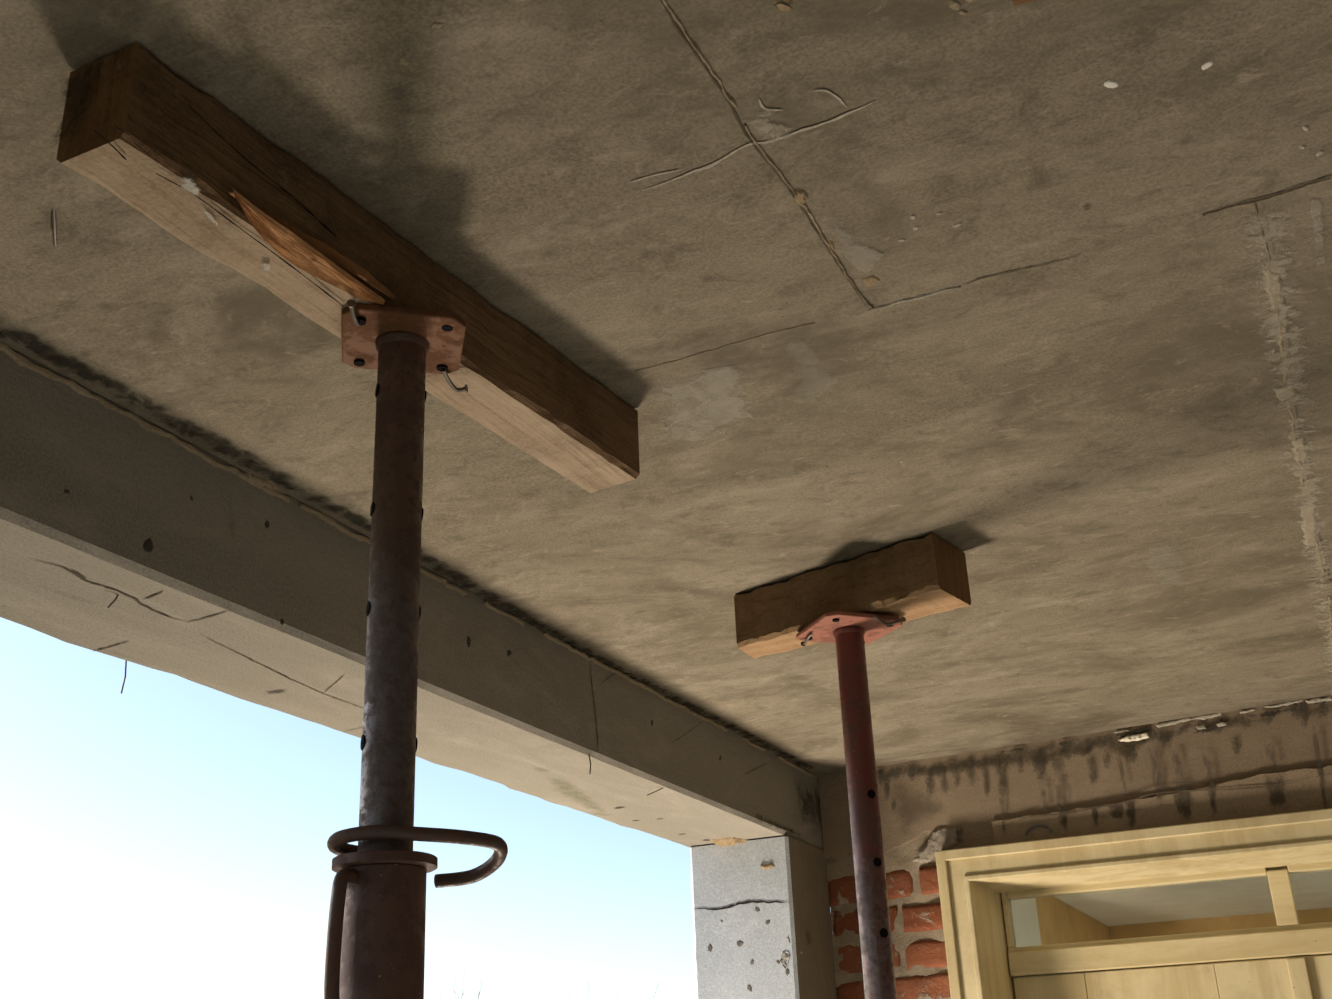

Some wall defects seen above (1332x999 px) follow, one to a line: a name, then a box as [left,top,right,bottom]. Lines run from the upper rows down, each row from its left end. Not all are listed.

crack [630,0,878,308]
crack [964,256,1078,286]
water stain [877,213,1332,824]
peeling [776,936,791,976]